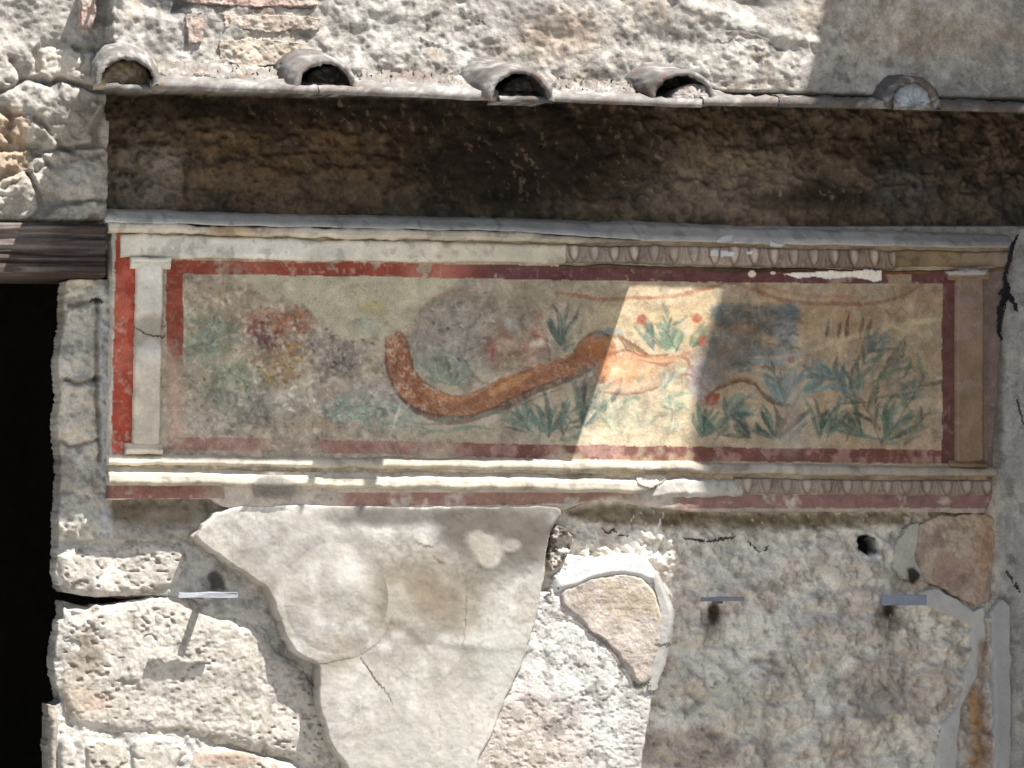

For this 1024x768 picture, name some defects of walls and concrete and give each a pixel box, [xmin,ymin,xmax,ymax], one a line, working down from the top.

spalling [710,235,753,257]
peeling [770,269,882,282]
crack [996,234,1019,341]
crack [134,326,166,339]
crack [683,536,769,553]
spalling [858,535,875,554]
crack [320,614,394,702]